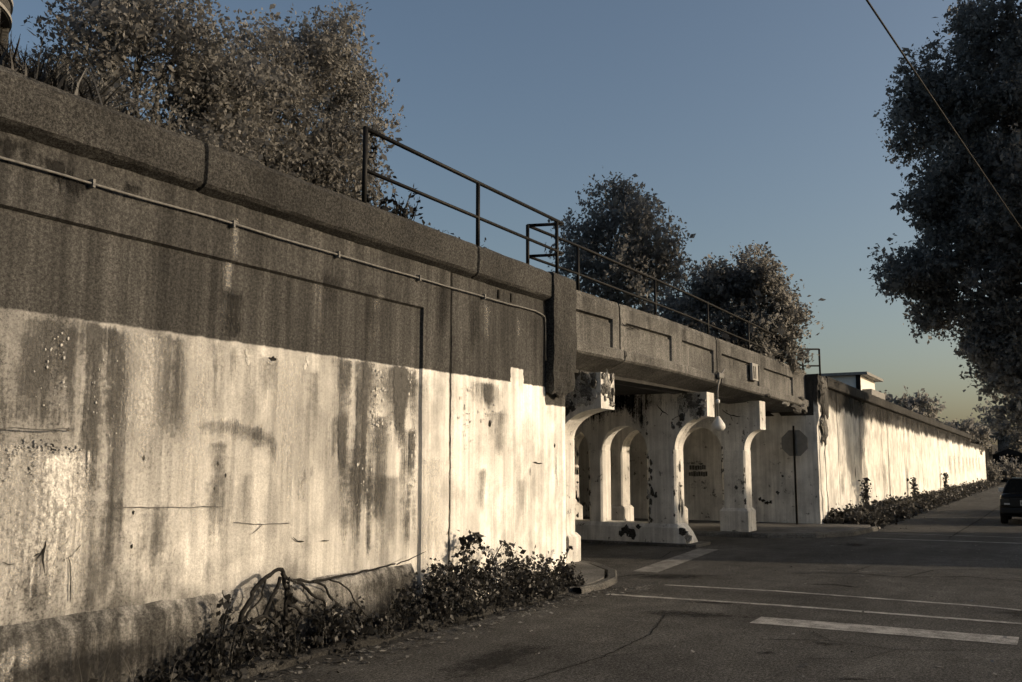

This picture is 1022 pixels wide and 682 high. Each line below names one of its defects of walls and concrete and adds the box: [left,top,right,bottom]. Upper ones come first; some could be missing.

leakage [140,338,186,430]
leakage [472,382,503,405]
spalling [565,368,615,417]
spalling [671,392,707,429]
leakage [0,319,128,602]
leakage [144,508,165,559]
leakage [333,358,418,551]
spalling [619,453,657,540]